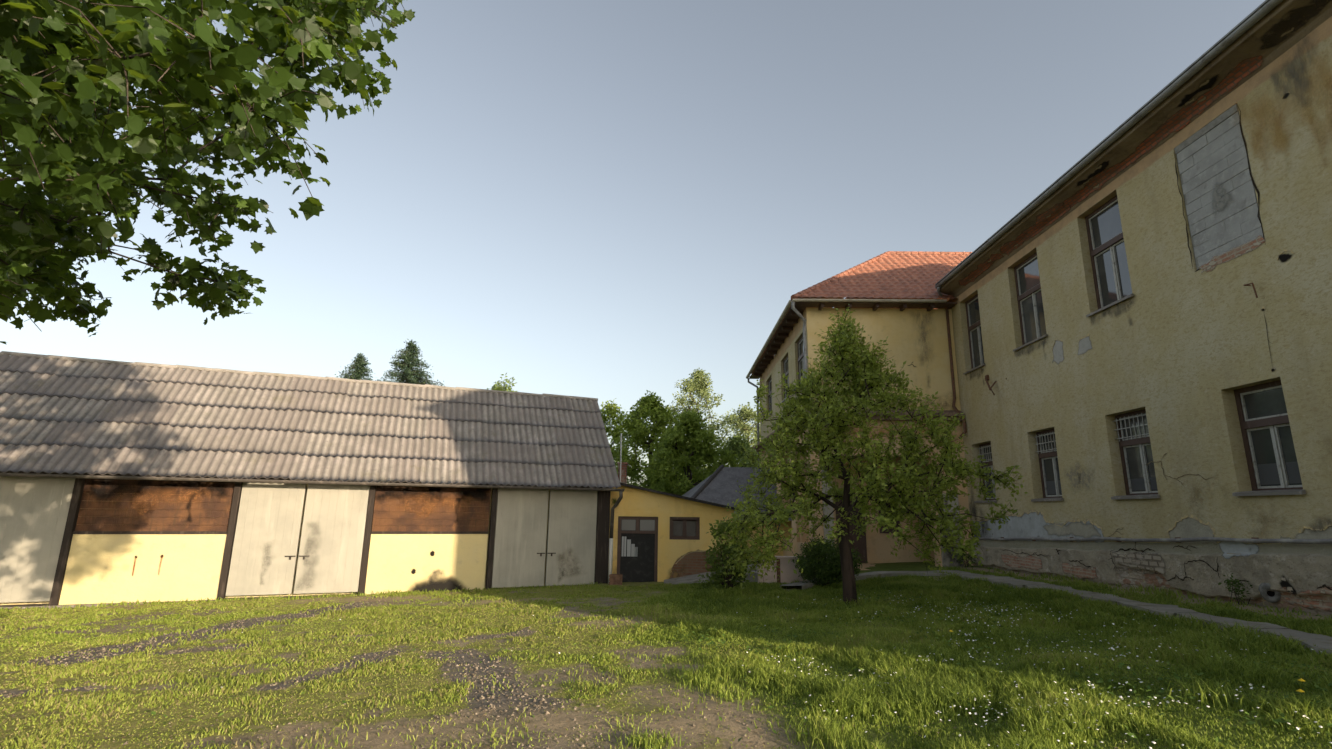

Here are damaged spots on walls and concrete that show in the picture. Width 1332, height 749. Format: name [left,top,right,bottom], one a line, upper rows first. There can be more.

spalling [959,0,1330,286]
peeling [972,510,1104,570]
spalling [1280,576,1301,597]